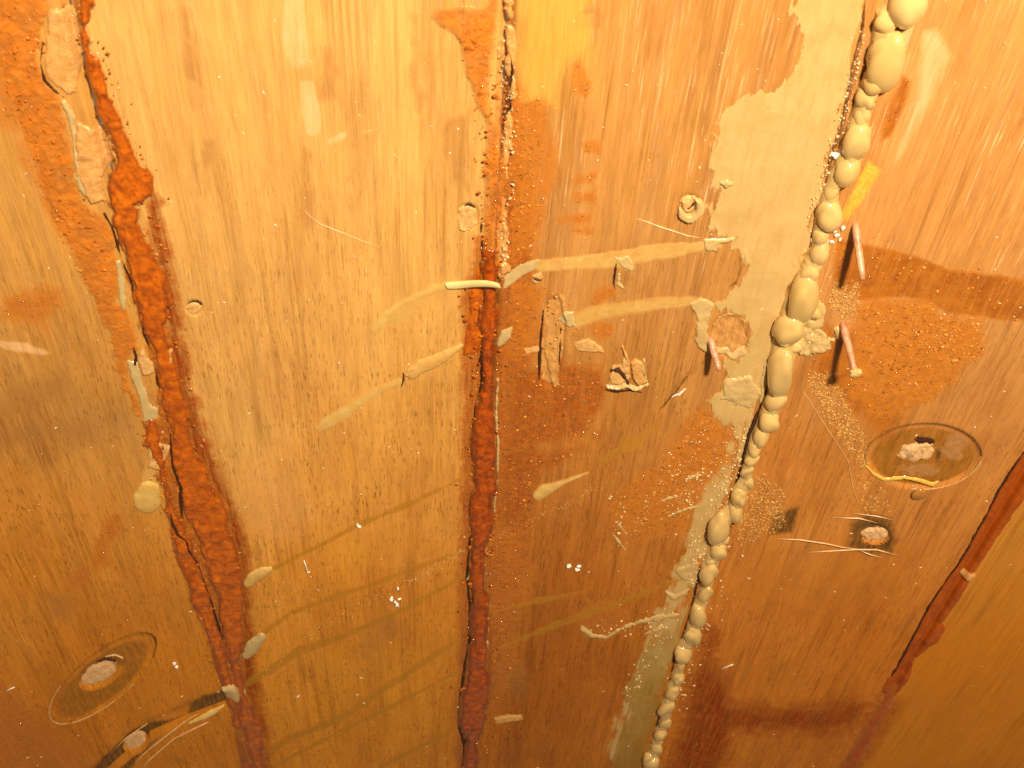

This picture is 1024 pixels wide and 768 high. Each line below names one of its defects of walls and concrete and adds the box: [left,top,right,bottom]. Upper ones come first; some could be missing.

peeling [44,5,94,95]
crack [506,56,514,113]
peeling [75,122,116,204]
crack [104,212,160,389]
crack [478,351,486,393]
peeling [605,346,649,391]
peeling [690,297,747,360]
peeling [798,300,841,357]
corrosion [454,83,605,767]
corrosion [147,192,269,768]
corrosion [609,410,729,542]
crack [166,416,224,642]